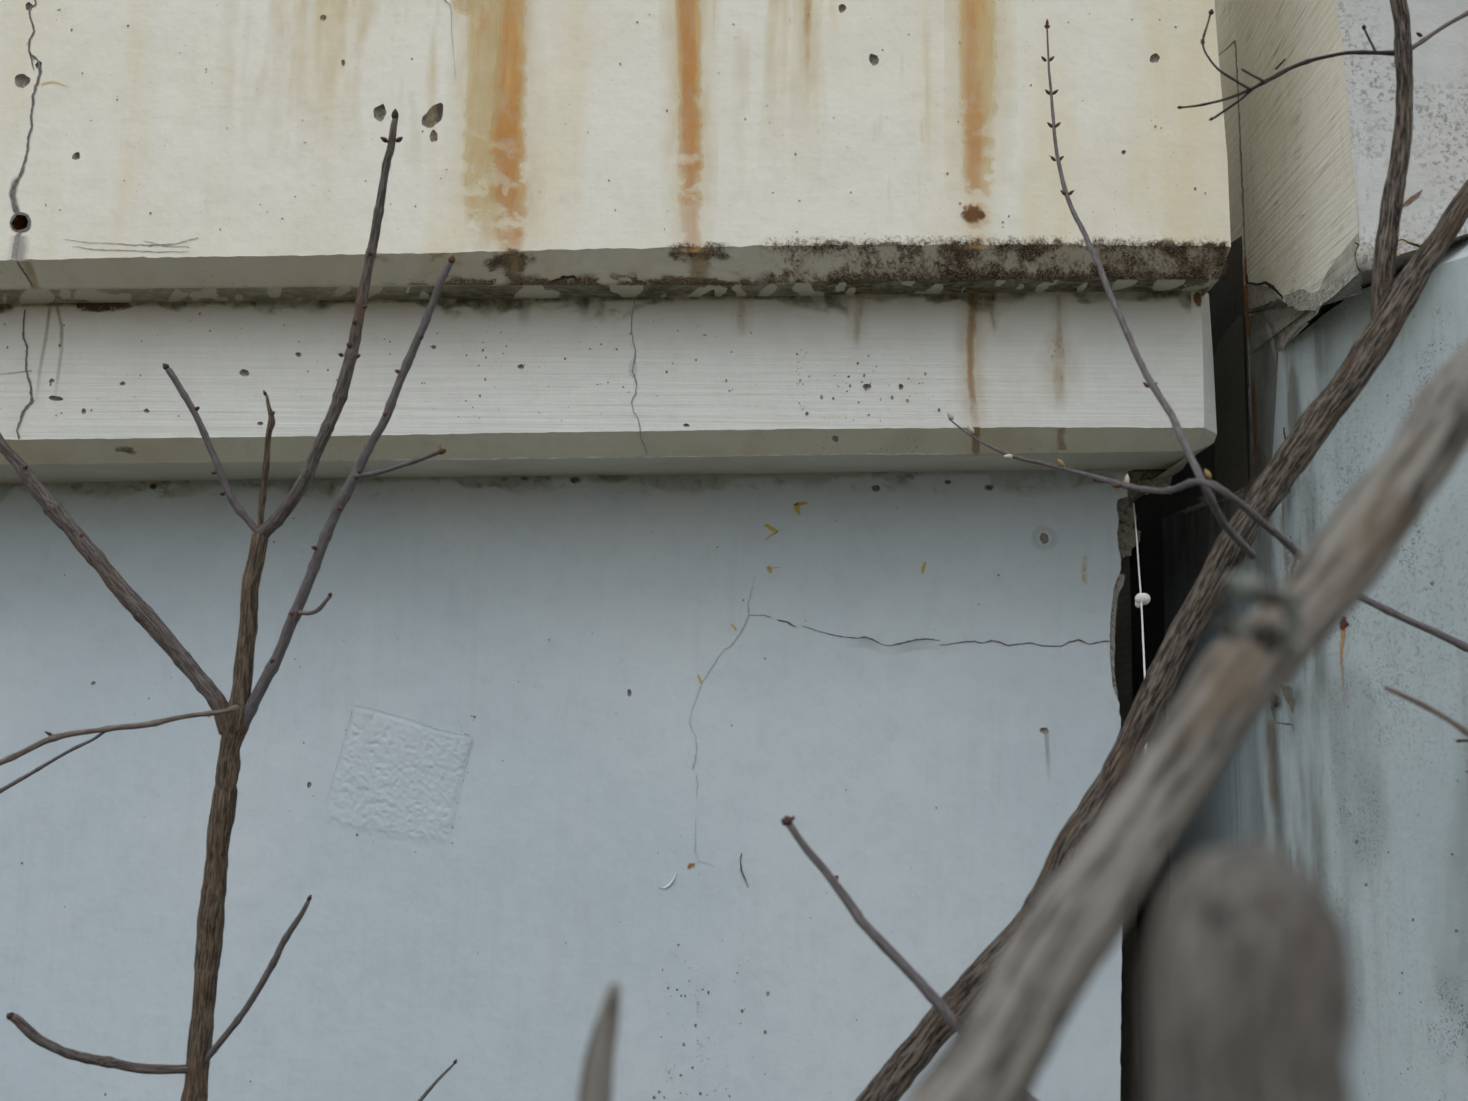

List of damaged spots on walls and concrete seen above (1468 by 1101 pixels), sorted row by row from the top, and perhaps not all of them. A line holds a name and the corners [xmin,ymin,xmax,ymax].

crack [4,0,42,439]
water stain [47,302,187,312]
rust [465,0,527,239]
crack [629,301,647,454]
rust [676,0,703,201]
water stain [398,279,1209,311]
rust [959,0,996,222]
crack [689,575,1110,867]